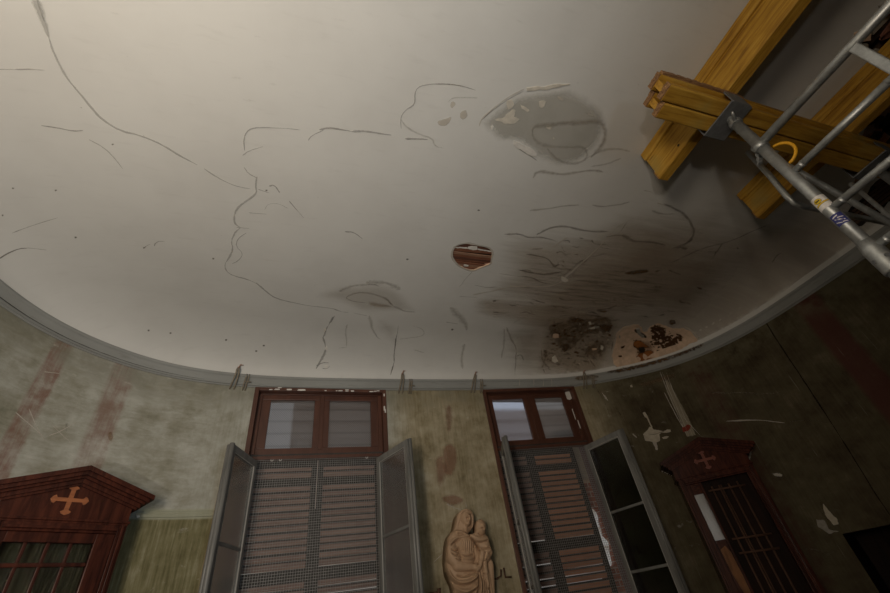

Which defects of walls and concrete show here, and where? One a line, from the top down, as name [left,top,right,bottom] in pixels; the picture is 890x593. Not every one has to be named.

crack [34,0,339,311]
flaking render [451,243,494,284]
leakage [543,280,630,380]
flaking render [611,320,699,367]
leakage [608,344,702,373]
flaking render [633,412,671,450]